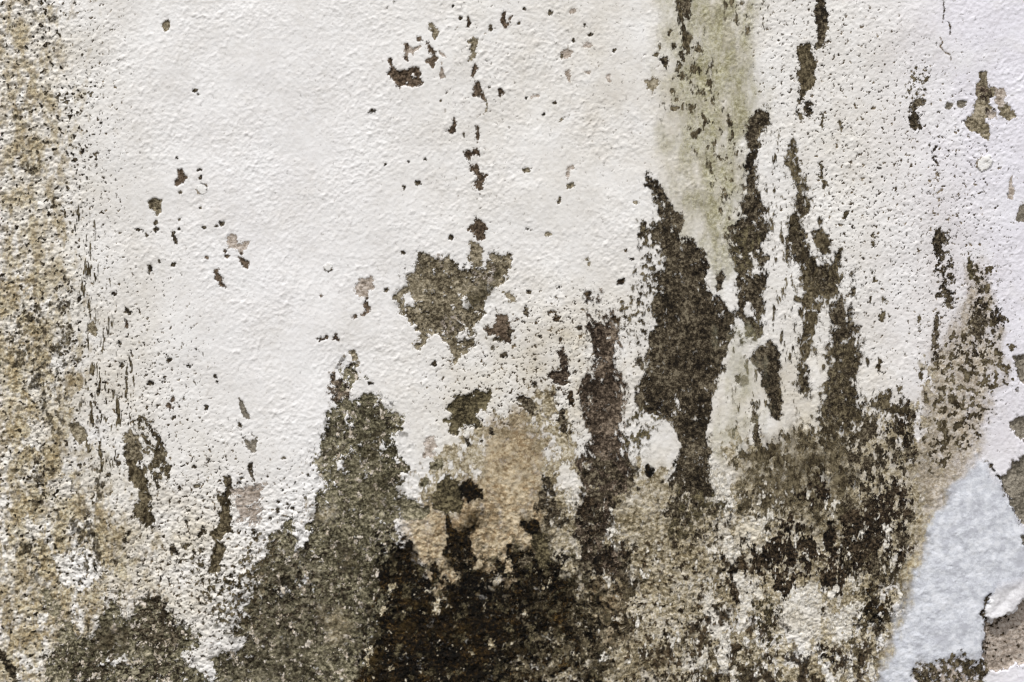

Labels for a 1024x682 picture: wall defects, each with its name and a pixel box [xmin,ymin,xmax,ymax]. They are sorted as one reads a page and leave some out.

peeling [387,22,446,89]
peeling [452,5,505,112]
peeling [945,71,1016,141]
peeling [448,117,488,194]
peeling [557,165,575,204]
peeling [353,217,542,366]
water stain [0,0,139,682]
water stain [347,0,1019,682]
peeling [985,456,1024,545]
peeling [980,582,1024,672]